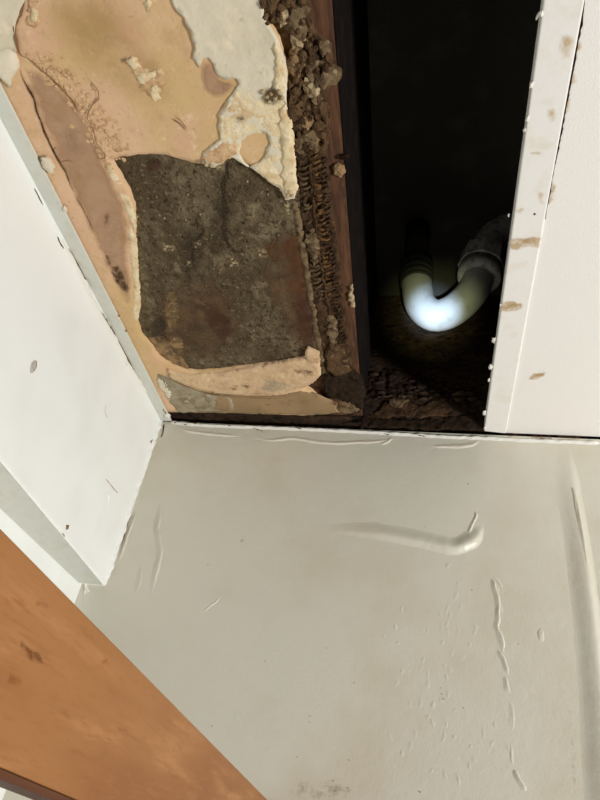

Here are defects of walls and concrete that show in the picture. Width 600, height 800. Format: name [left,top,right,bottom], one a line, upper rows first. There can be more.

spalling [0,0,600,582]